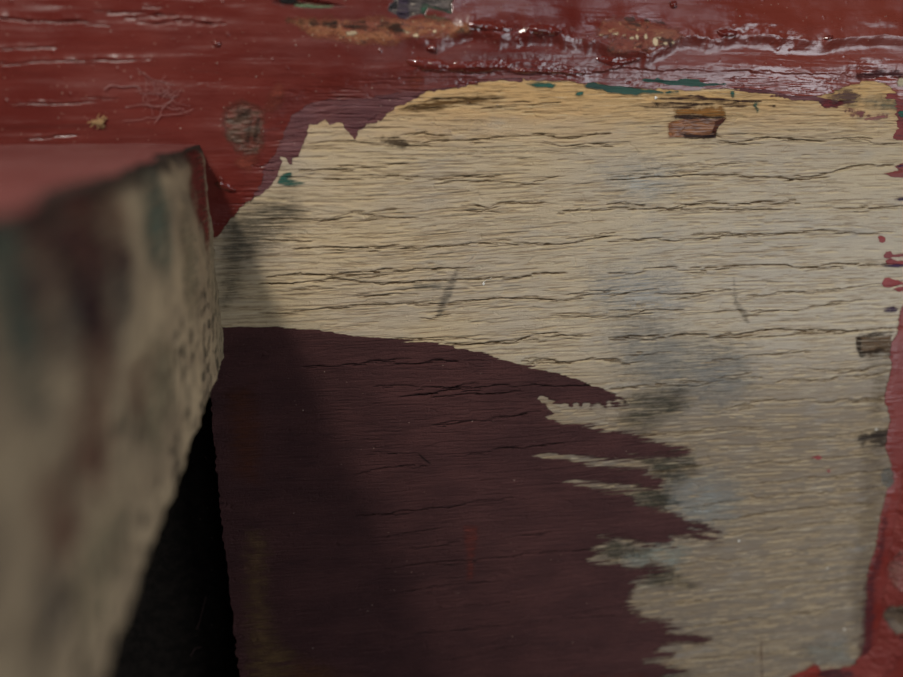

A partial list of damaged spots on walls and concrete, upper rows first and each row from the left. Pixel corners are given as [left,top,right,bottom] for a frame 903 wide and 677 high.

peeling [272,0,470,45]
crack [395,97,559,110]
peeling [831,90,861,103]
peeling [223,102,264,154]
peeling [668,106,725,139]
crack [259,131,903,536]
peeling [884,606,903,639]